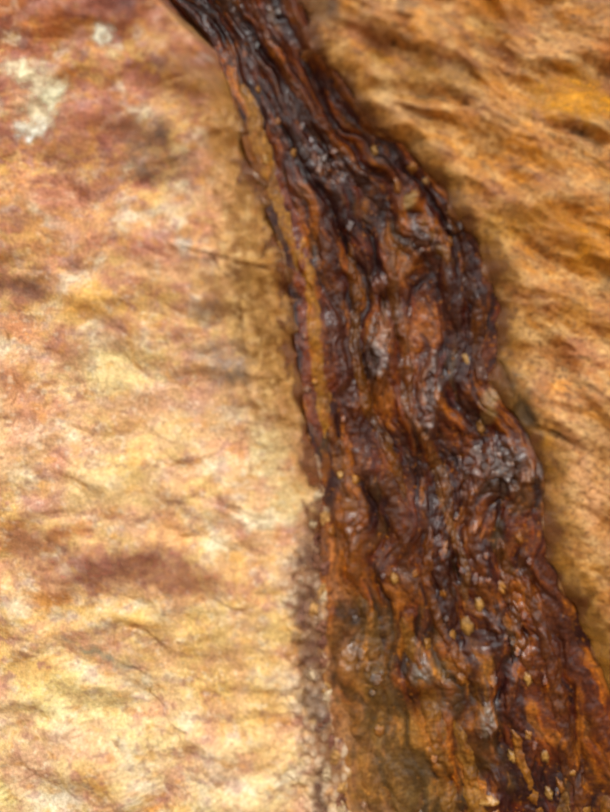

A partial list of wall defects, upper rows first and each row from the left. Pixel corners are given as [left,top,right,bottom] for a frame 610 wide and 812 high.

corrosion [170,0,610,812]